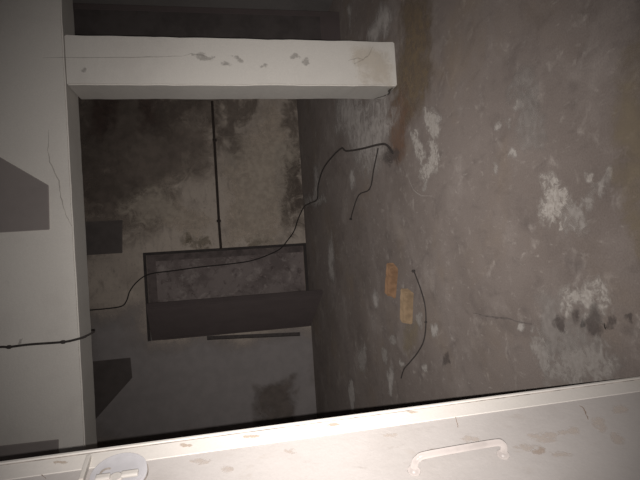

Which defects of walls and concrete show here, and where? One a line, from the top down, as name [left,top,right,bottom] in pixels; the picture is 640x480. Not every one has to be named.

corrosion [389,0,430,159]
damp [78,96,217,235]
damp [219,99,326,244]